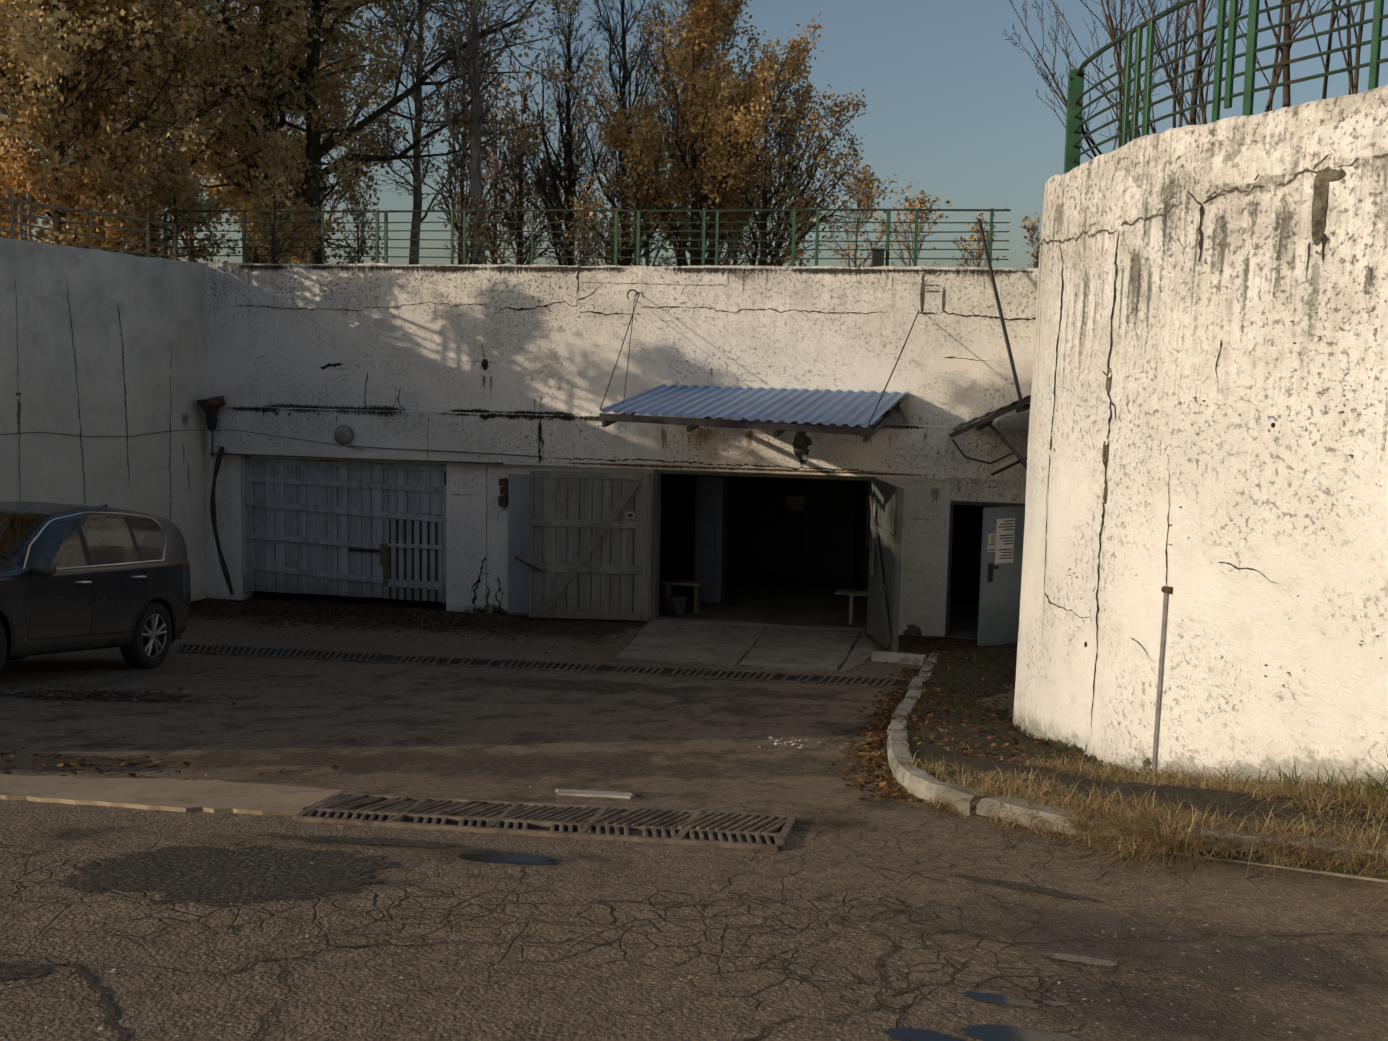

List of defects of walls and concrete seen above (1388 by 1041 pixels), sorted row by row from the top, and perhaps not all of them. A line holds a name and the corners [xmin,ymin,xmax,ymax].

crack [231,264,888,316]
water stain [1064,274,1103,363]
water stain [1119,176,1228,344]
water stain [1270,197,1295,296]
spalling [1311,167,1346,246]
spalling [793,432,814,461]
crack [941,153,1388,757]